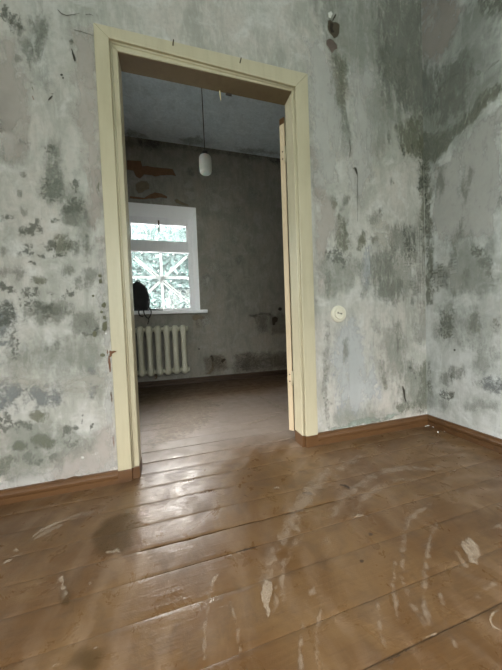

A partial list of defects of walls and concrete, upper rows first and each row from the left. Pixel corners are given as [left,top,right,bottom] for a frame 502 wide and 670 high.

water stain [40,178,84,213]
spalling [126,160,189,206]
water stain [395,84,502,303]
water stain [19,219,42,236]
water stain [19,236,71,265]
water stain [328,216,348,268]
water stain [0,277,54,356]
water stain [332,363,431,429]
water stain [0,378,61,473]